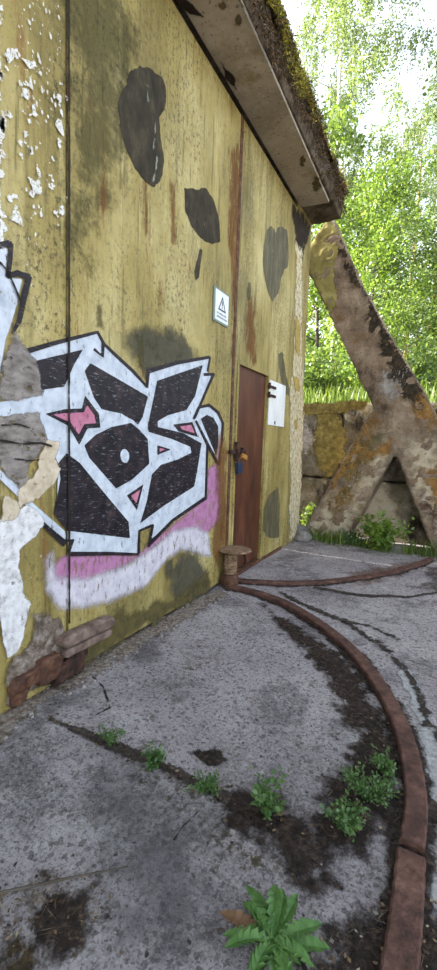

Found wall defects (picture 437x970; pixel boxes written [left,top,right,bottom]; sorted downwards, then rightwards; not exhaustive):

peeling [0,0,68,254]
flaking render [0,333,43,401]
rust [229,146,256,363]
peeling [0,412,229,744]